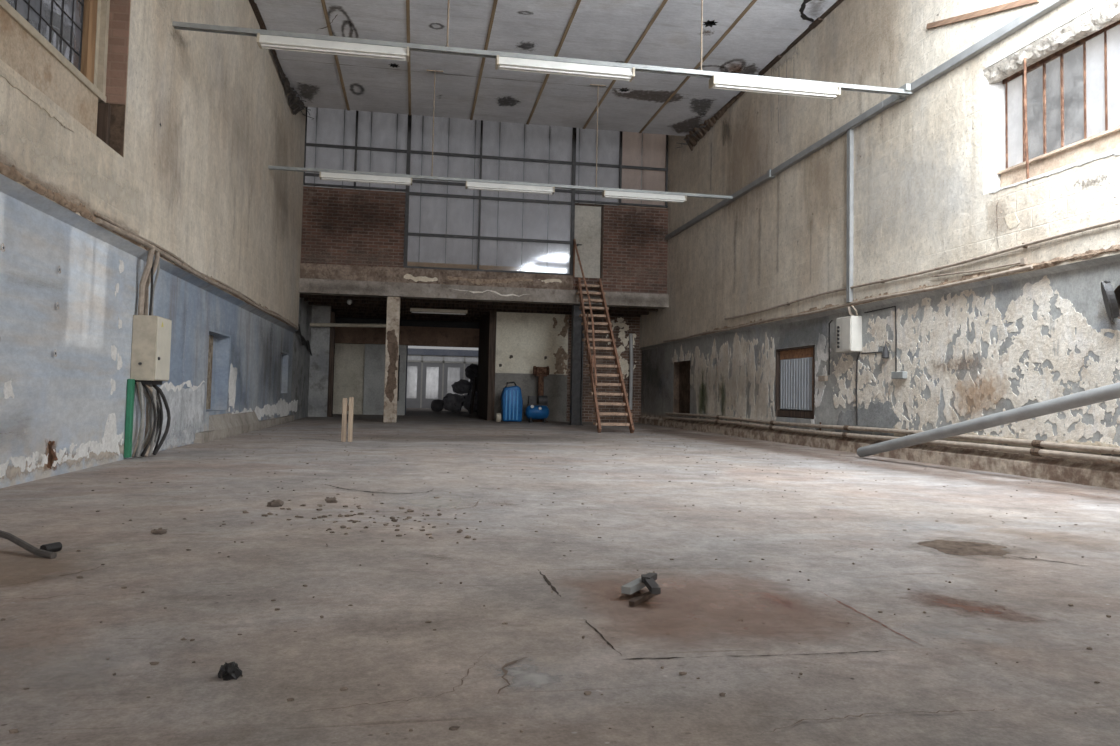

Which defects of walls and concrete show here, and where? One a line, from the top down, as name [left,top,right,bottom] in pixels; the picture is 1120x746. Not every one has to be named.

spalling [0,162,195,273]
peeling [606,317,637,379]
peeling [672,244,1120,461]
corrosion [44,441,58,470]
peeling [0,413,123,478]
peeling [148,384,205,452]
peeling [228,363,298,420]
crack [540,569,624,597]
crack [586,620,707,659]
water stain [930,595,1032,622]